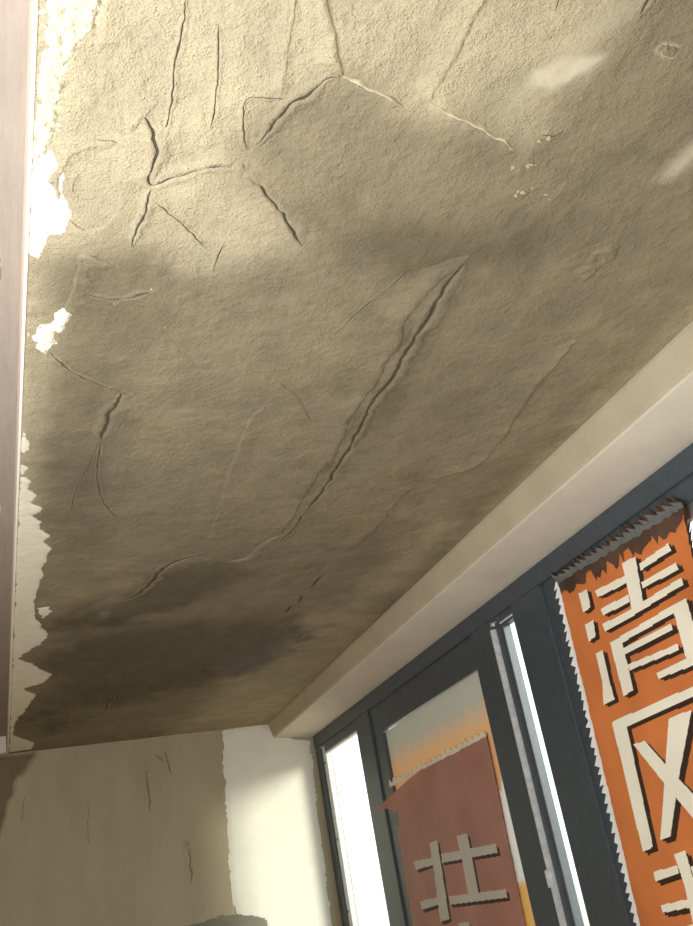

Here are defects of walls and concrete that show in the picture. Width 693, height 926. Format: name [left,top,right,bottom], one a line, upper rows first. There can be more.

flaking render [29,0,109,259]
crack [127,0,342,273]
crack [637,0,659,15]
peeling [21,432,29,453]
flaking render [27,308,72,354]
crack [48,351,134,518]
crack [85,253,471,621]
peeling [9,465,53,752]